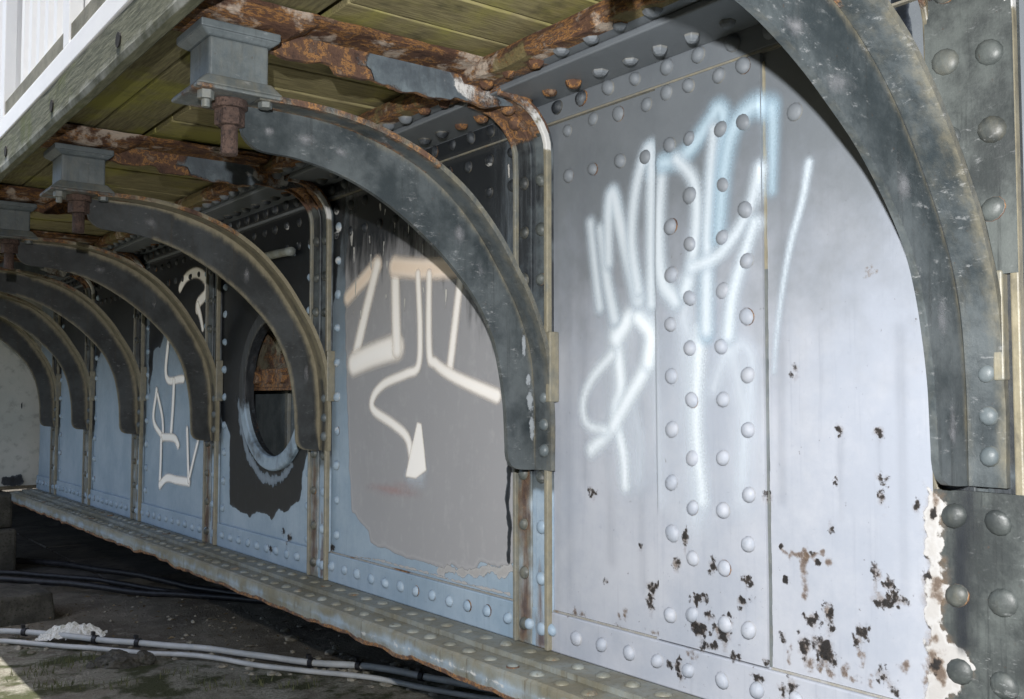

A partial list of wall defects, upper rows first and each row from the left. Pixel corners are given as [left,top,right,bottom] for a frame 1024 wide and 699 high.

corrosion [519,476,530,537]
corrosion [521,579,541,636]
corrosion [646,580,659,609]
corrosion [666,575,754,680]
corrosion [778,543,831,599]
corrosion [778,602,853,697]
corrosion [852,626,871,657]
corrosion [870,562,909,609]
peeling [923,487,976,699]